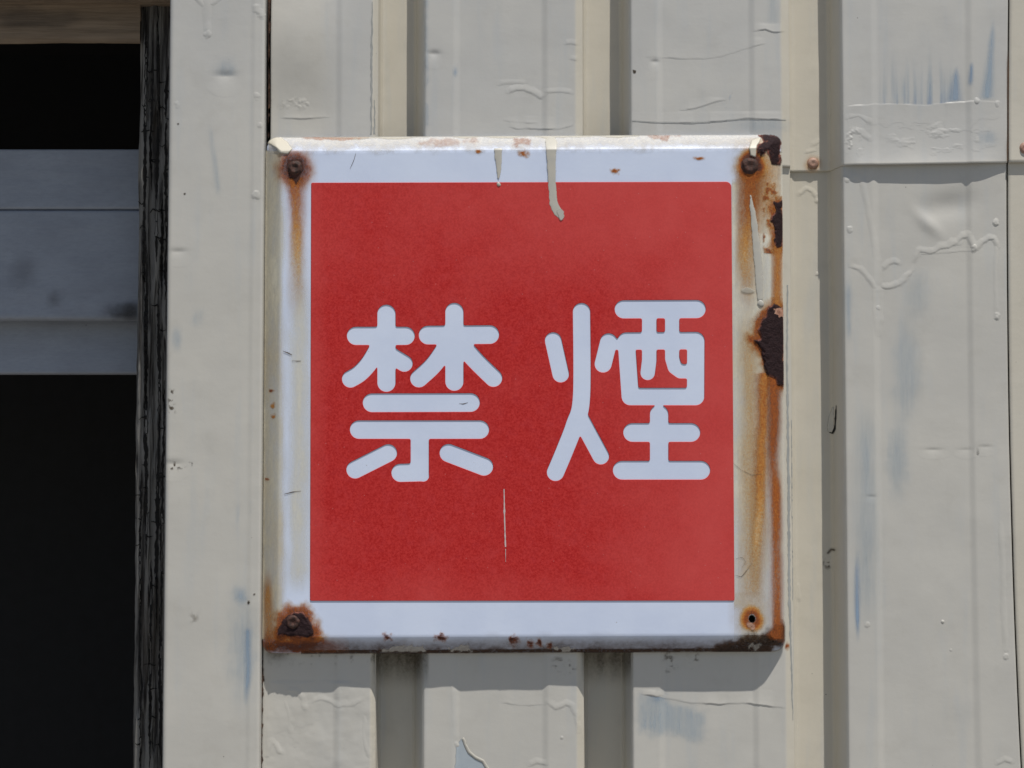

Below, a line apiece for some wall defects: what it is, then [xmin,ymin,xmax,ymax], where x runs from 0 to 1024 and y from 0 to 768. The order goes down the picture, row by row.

rust [278,152,312,281]
rust [736,148,781,284]
rust [291,295,307,577]
rust [248,585,789,768]